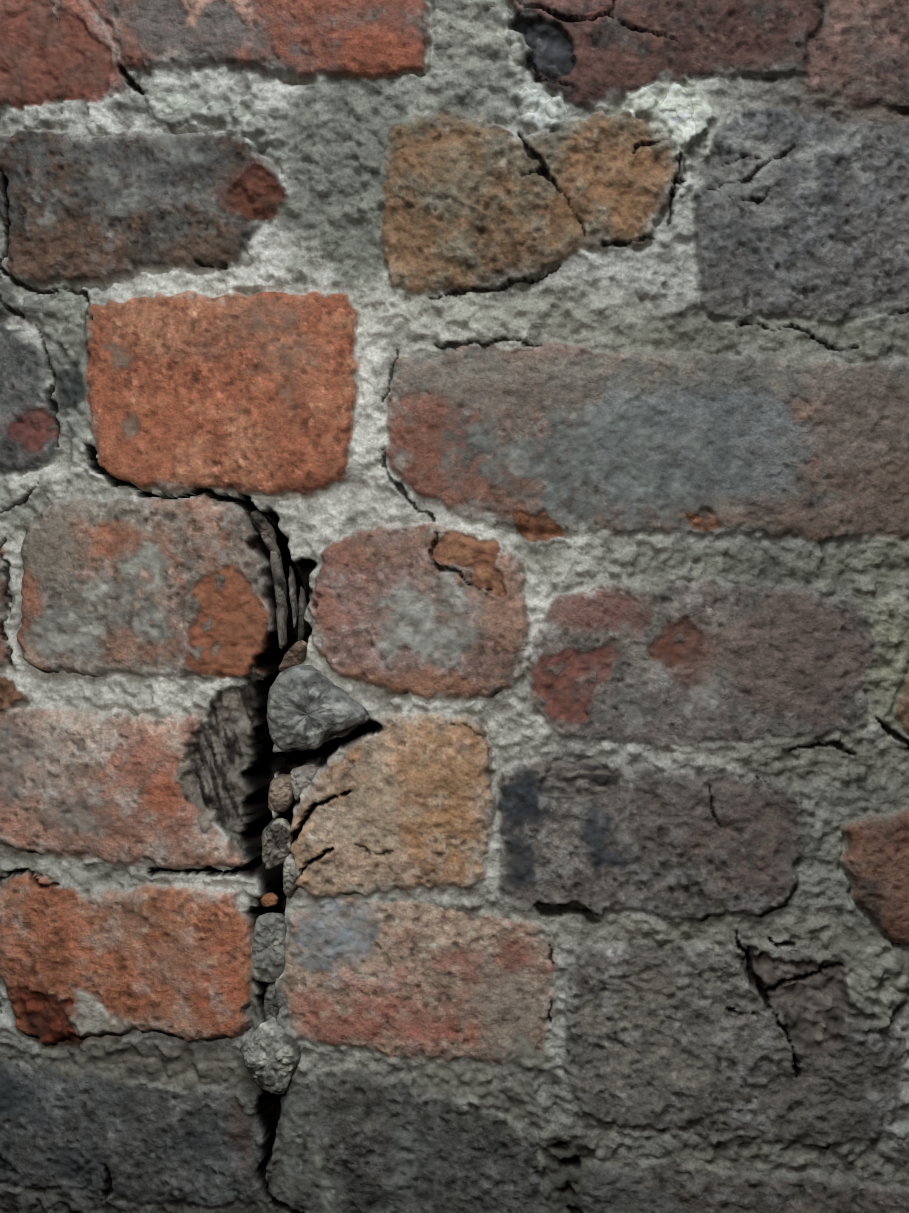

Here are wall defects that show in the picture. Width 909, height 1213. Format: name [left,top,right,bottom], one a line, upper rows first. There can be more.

crack [119,66,145,95]
crack [518,134,795,247]
crack [430,265,561,299]
crack [382,350,398,402]
crack [0,169,393,927]
crack [382,449,492,590]
crack [258,981,271,1007]
crack [726,931,843,1076]
crack [103,1167,113,1198]
crack [258,1090,304,1213]